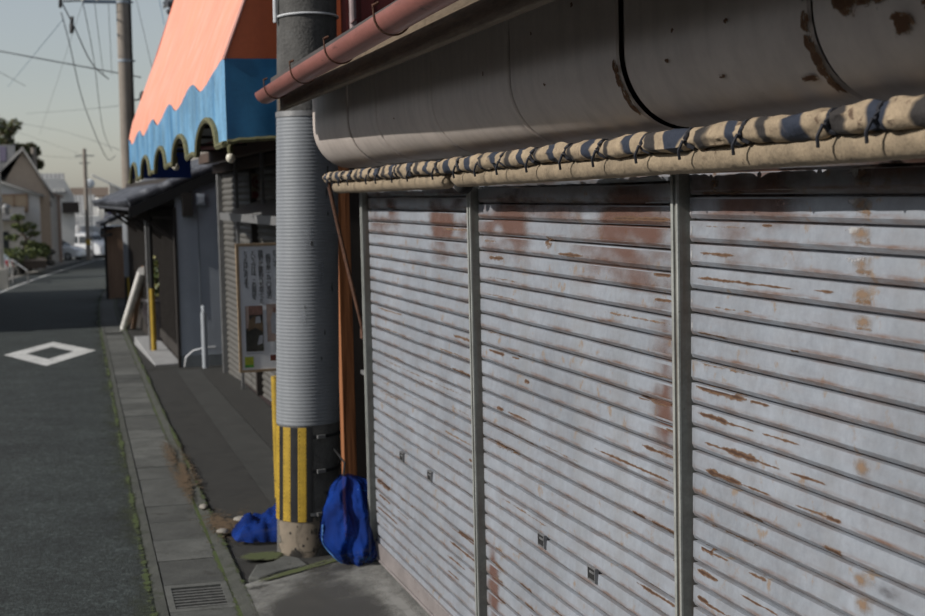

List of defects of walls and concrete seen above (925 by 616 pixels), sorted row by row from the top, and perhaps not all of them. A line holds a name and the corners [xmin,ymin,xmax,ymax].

corrosion [831,0,882,16]
corrosion [890,12,915,35]
corrosion [800,0,847,93]
corrosion [703,168,796,228]
corrosion [484,197,529,249]
corrosion [545,237,580,257]
corrosion [594,186,671,285]
corrosion [700,277,790,289]
corrosion [696,384,769,407]
corrosion [700,412,753,431]
corrosion [705,442,779,469]
corrosion [706,469,768,495]